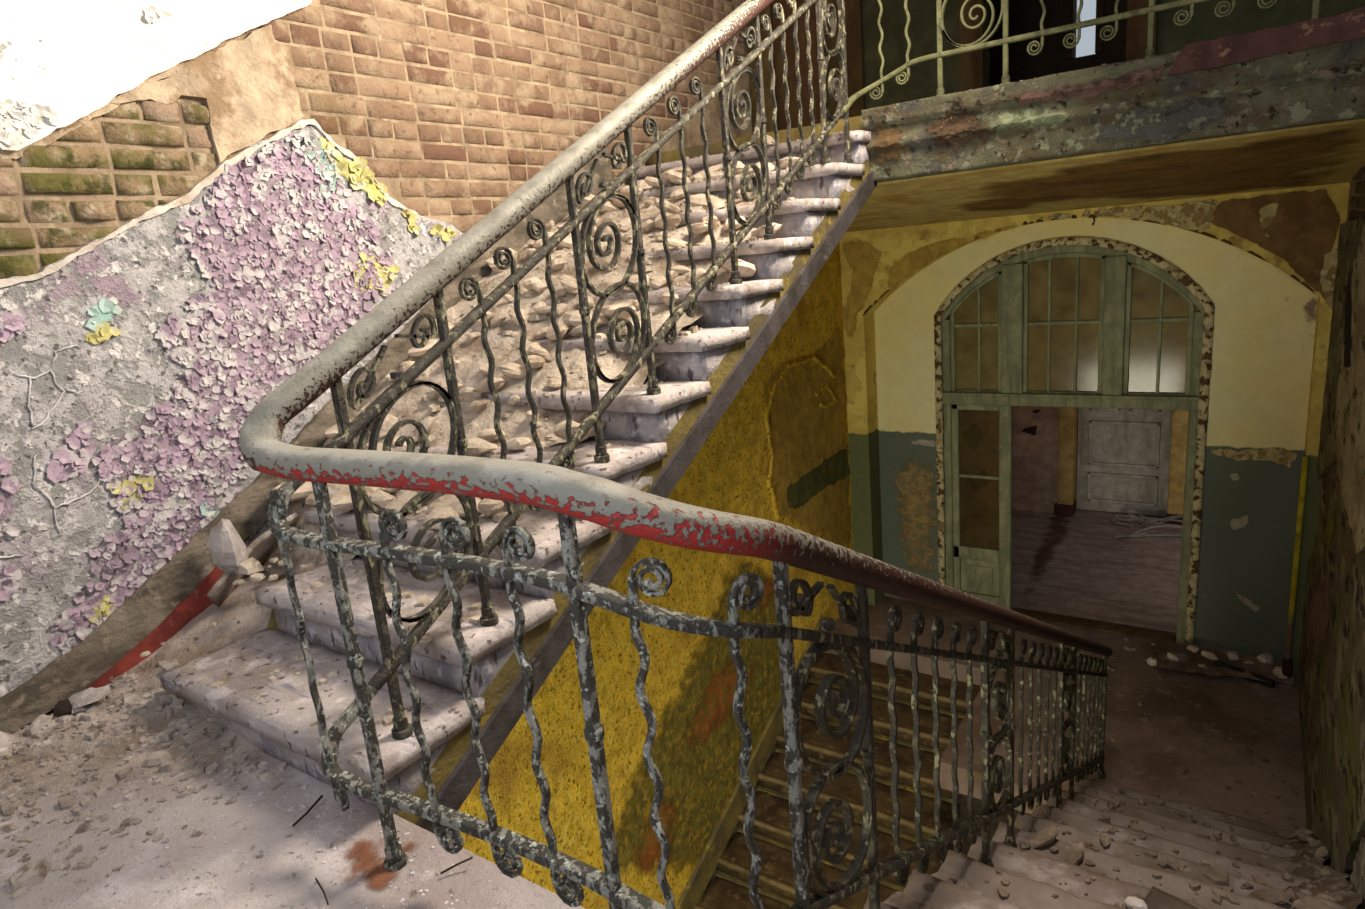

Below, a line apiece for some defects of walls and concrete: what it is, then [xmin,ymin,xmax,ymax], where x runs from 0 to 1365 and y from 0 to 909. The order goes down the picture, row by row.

flaking render [0,0,746,655]
flaking render [764,167,1365,547]
peeling [911,236,1298,645]
damp [965,130,1353,211]
peeling [995,7,1365,129]
corrosion [346,840,396,890]